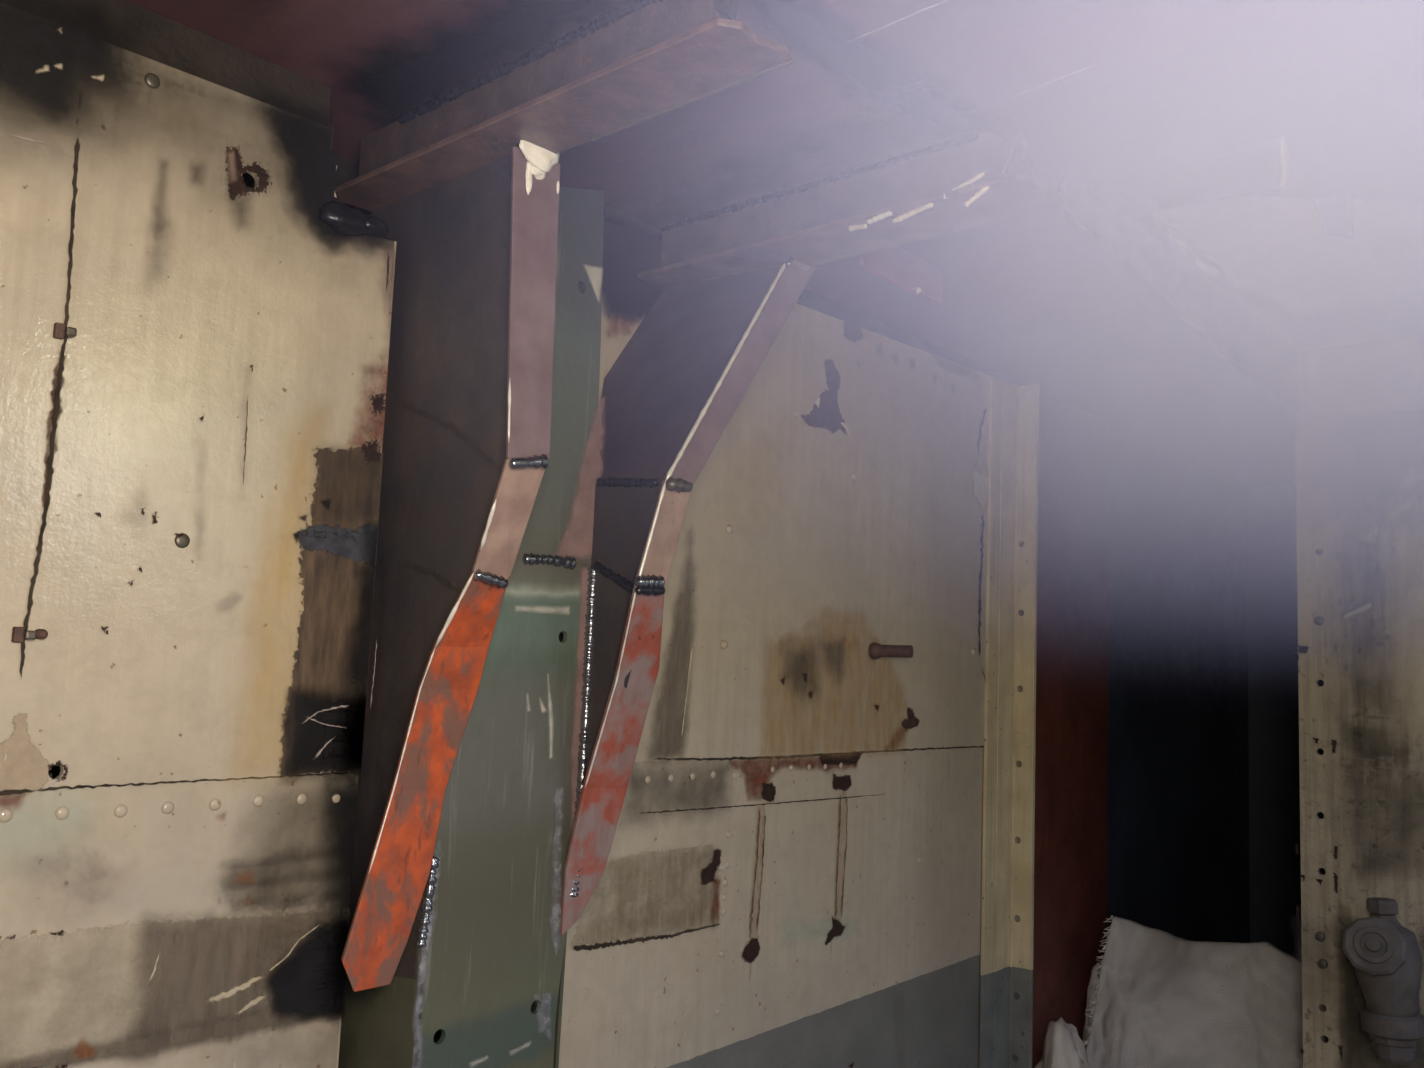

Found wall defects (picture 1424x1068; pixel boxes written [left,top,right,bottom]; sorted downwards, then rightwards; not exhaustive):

leakage [0,0,118,120]
crack [20,95,81,677]
peeling [793,359,852,437]
peeling [0,714,68,795]
corrosion [733,753,863,964]